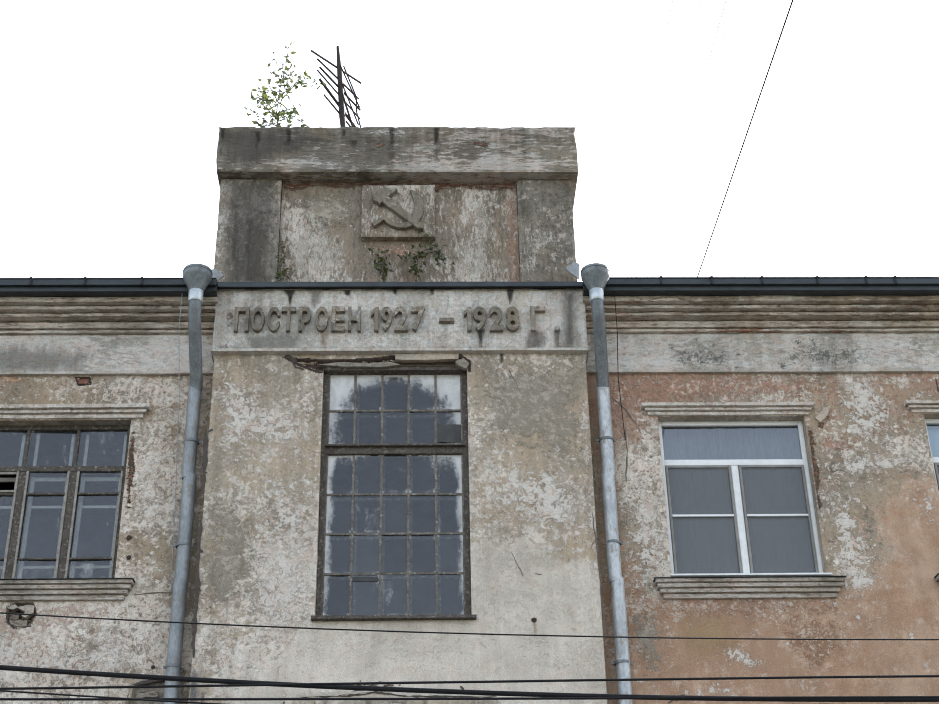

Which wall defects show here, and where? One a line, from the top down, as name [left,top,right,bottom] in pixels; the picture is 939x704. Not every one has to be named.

spalling [285,353,471,373]
peeling [610,379,641,427]
peeling [473,364,598,582]
peeling [615,374,919,684]
peeling [0,602,165,704]